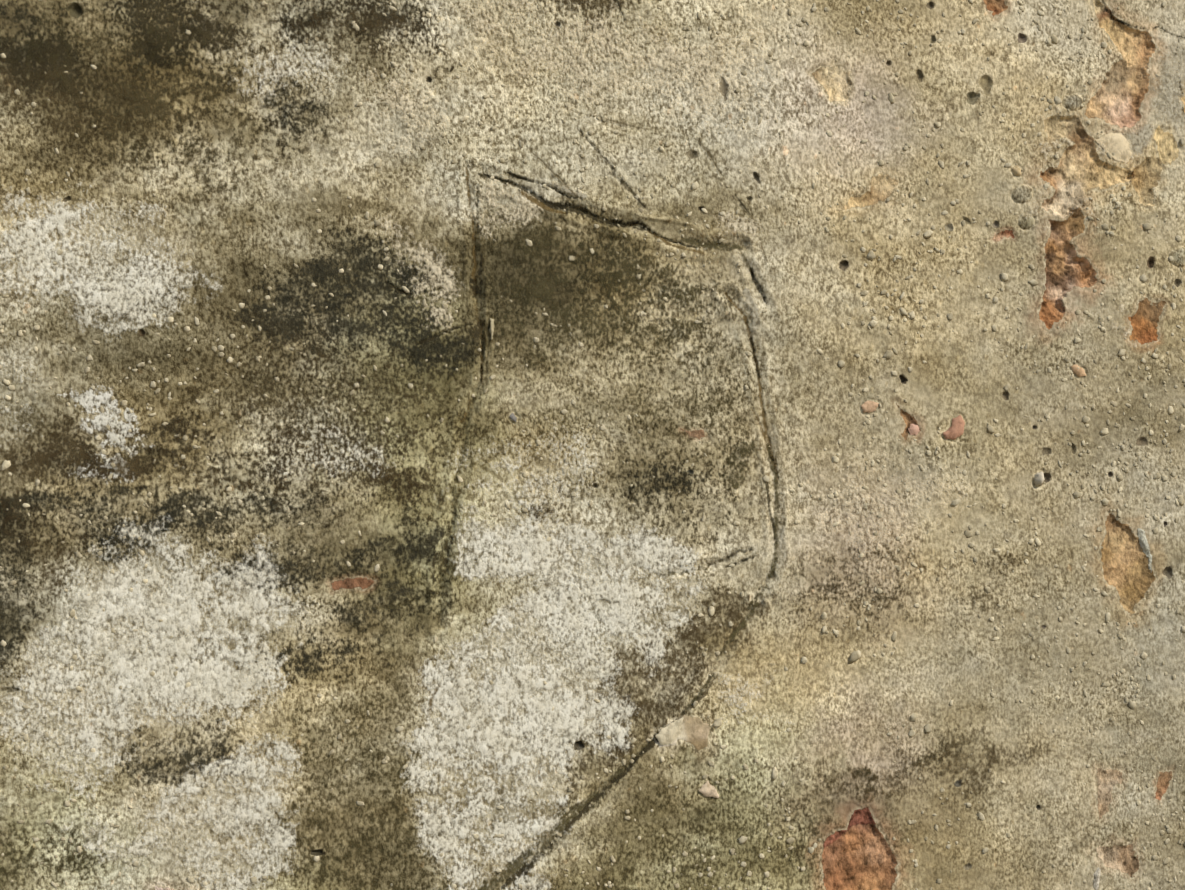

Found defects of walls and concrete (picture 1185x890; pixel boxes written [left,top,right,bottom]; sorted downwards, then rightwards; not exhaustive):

damp [0,0,243,163]
damp [244,0,444,147]
damp [452,0,763,120]
spalling [1026,0,1179,329]
damp [0,187,222,334]
crack [386,282,412,295]
damp [473,170,726,363]
damp [0,213,774,890]
crack [370,521,454,615]
crack [416,167,779,890]
spalling [1101,513,1173,616]
spalling [821,807,898,890]